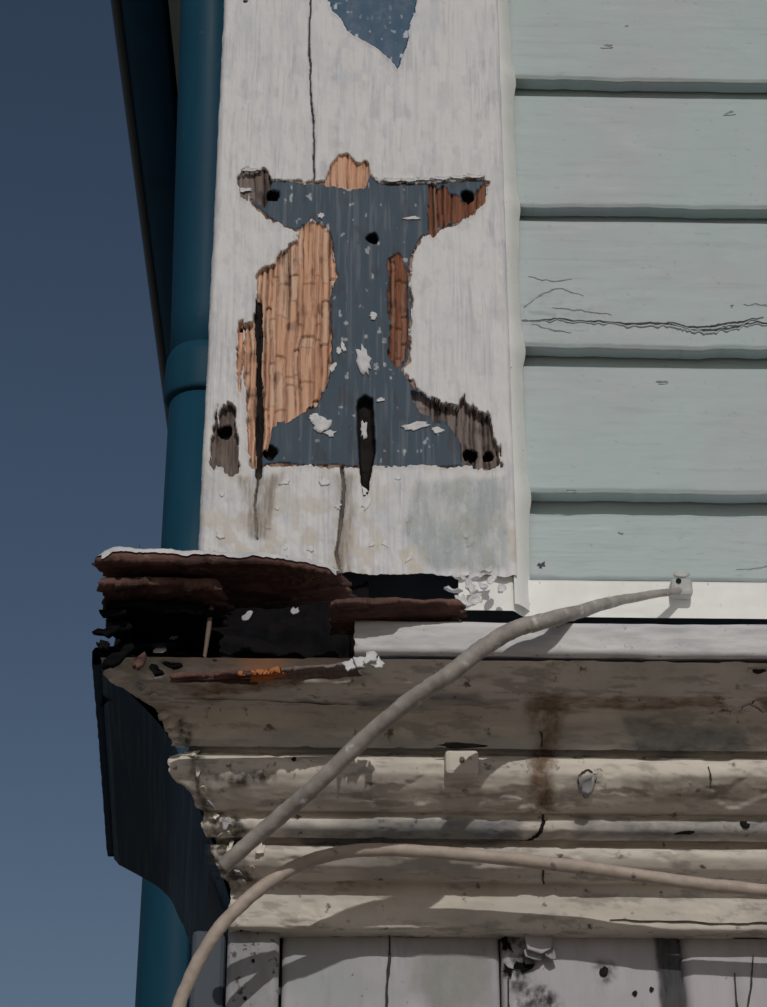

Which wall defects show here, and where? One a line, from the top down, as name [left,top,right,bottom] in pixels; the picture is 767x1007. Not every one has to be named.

peeling [328,0,417,69]
crack [307,0,315,181]
peeling [210,153,503,511]
crack [522,276,767,335]
damp [230,772,266,786]
damp [195,779,252,883]
crack [610,918,767,926]
damp [513,981,553,1007]